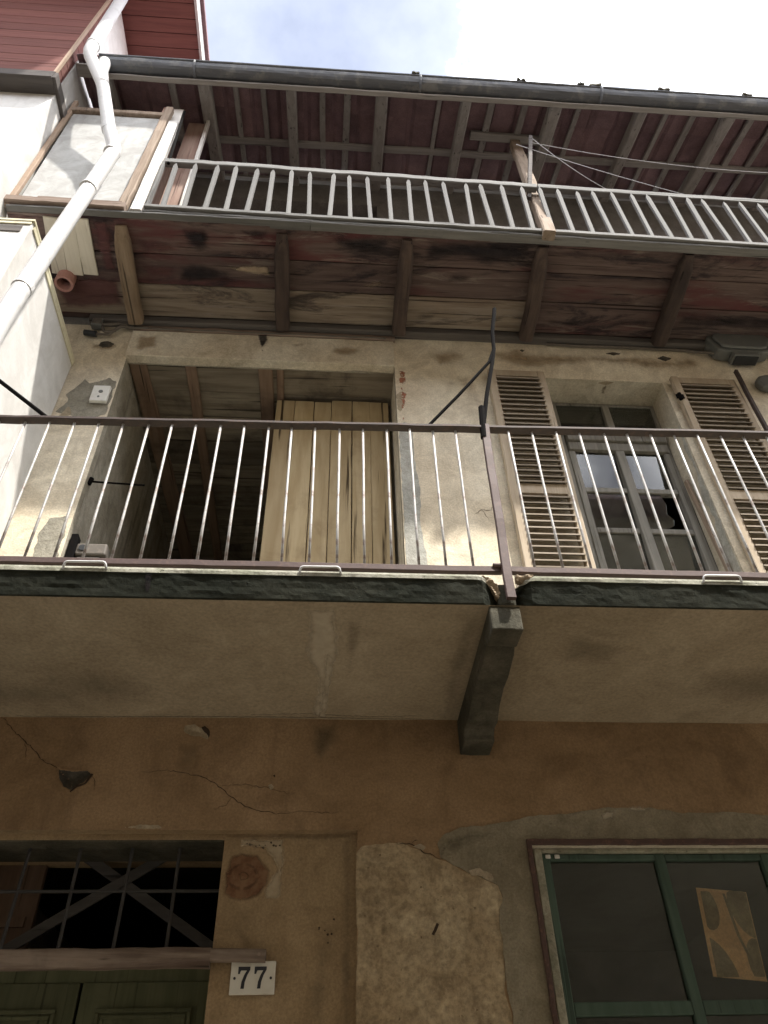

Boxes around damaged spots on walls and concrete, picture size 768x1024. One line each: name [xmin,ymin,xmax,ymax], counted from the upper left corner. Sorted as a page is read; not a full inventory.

spalling [482,574,534,606]
leakage [309,611,337,717]
crack [157,770,329,814]
peeling [355,842,512,1024]